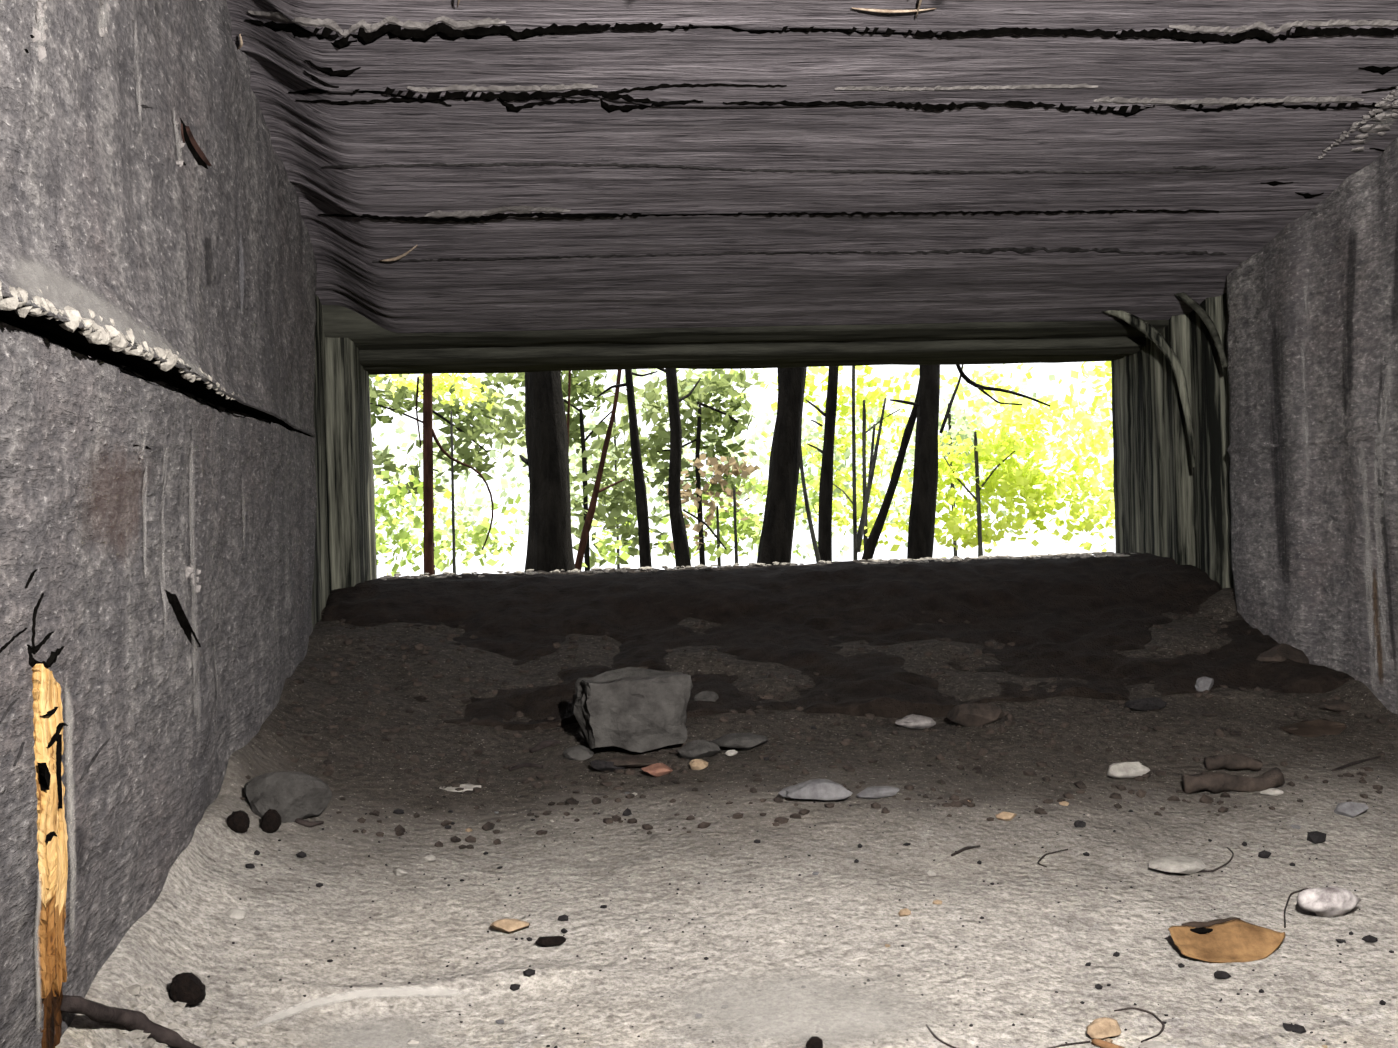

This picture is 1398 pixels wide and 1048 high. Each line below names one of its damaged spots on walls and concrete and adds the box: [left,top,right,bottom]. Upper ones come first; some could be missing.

crack [245,10,1398,117]
spalling [1317,86,1398,159]
crack [318,205,1219,223]
crack [321,163,1324,199]
crack [373,247,1227,262]
crack [0,281,311,436]